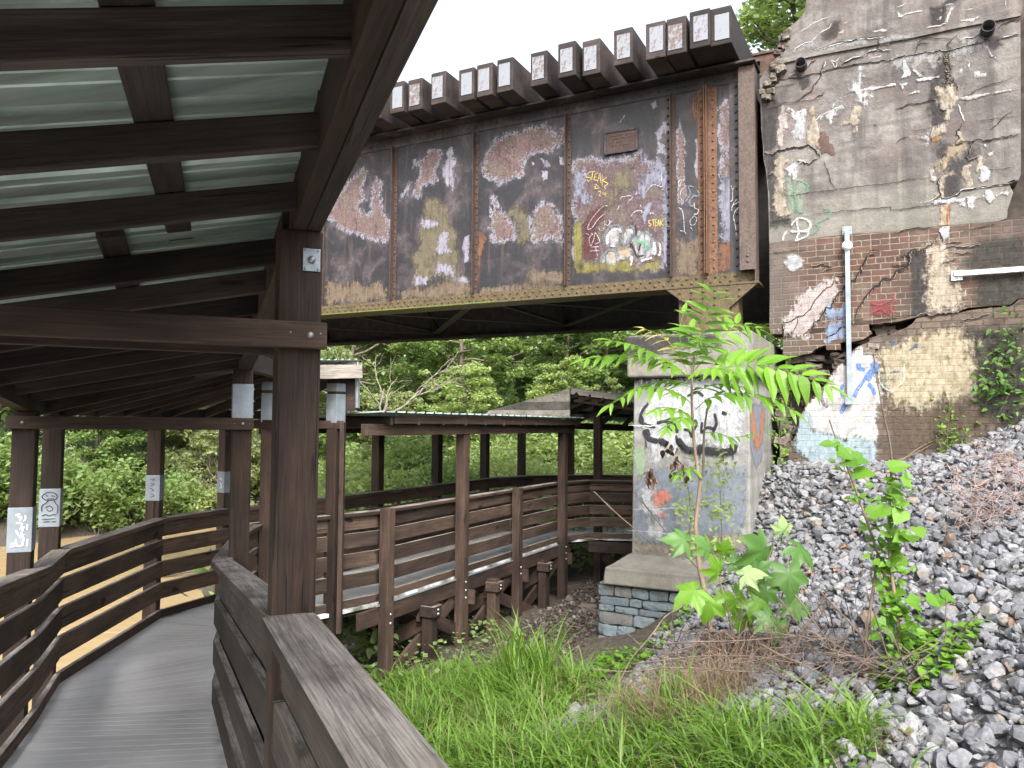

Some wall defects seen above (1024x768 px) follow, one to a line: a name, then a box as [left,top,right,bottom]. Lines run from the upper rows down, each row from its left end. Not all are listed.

spalling [759,26,792,106]
crack [761,3,1023,120]
spalling [943,52,959,90]
peeling [324,95,698,306]
spalling [819,132,835,155]
crack [765,78,1019,338]